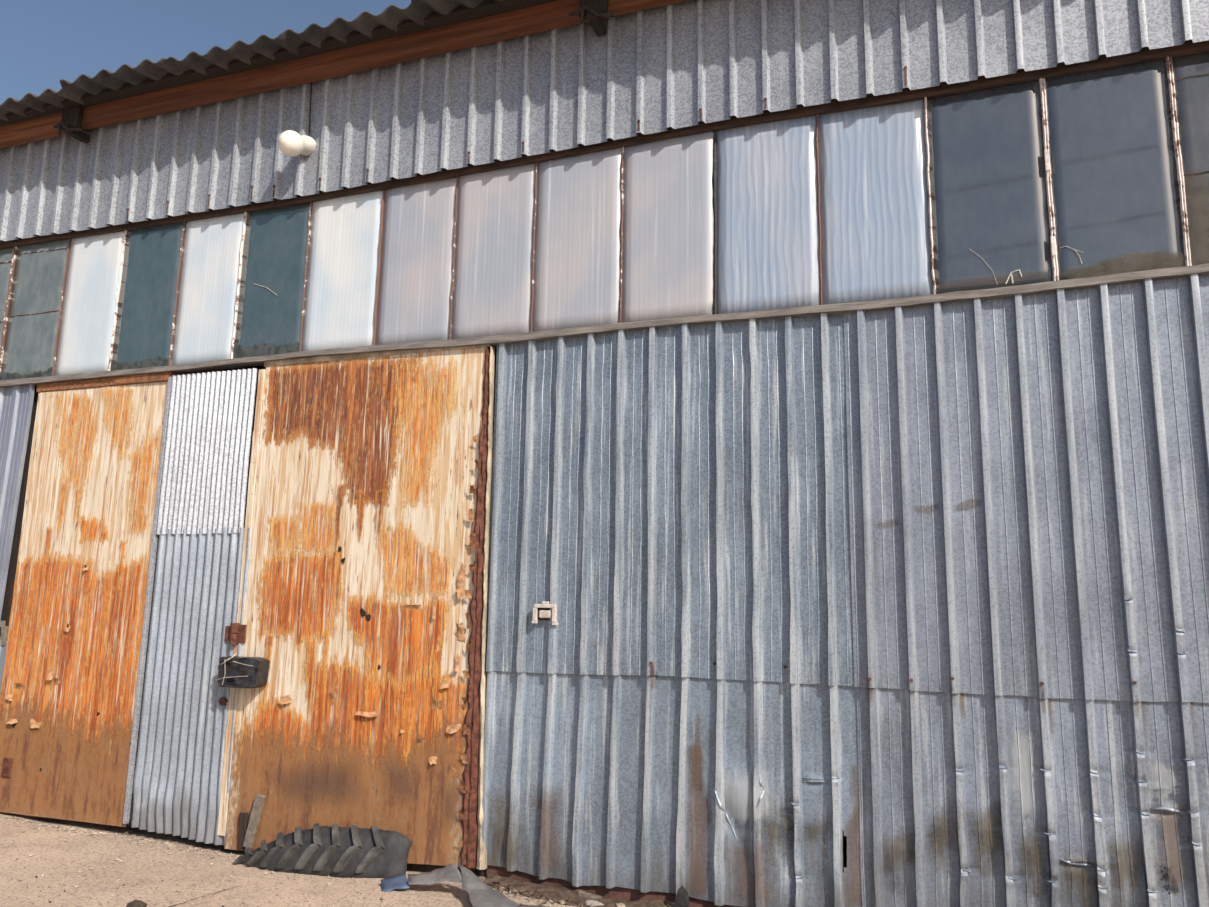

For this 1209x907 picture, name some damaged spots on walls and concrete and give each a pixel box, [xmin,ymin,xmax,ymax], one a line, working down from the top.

rust [0,372,170,827]
rust [224,354,467,867]
rust [849,825,858,900]
water stain [1159,813,1184,882]